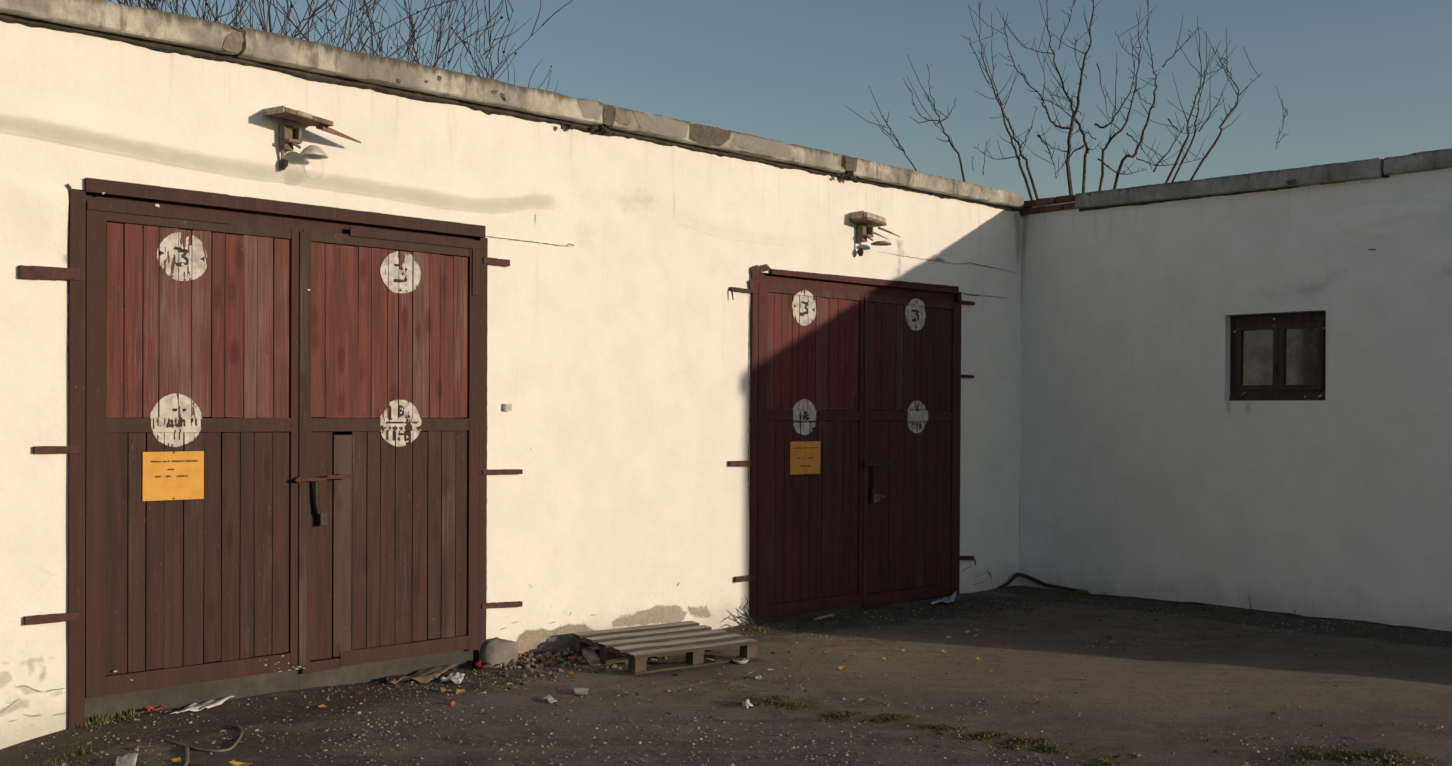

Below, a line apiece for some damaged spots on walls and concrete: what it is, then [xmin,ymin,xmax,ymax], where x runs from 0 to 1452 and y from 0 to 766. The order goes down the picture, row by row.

flaking render [612,606,710,626]
flaking render [517,625,593,657]